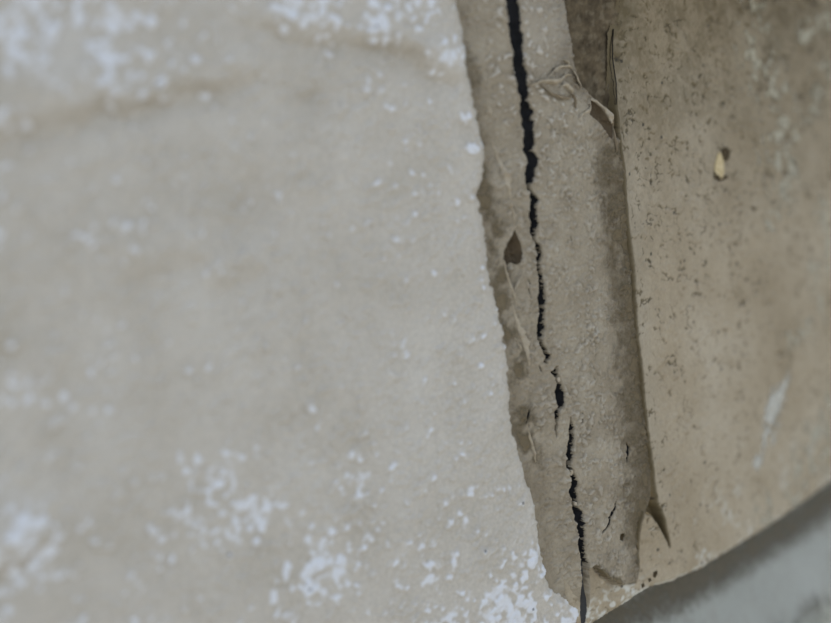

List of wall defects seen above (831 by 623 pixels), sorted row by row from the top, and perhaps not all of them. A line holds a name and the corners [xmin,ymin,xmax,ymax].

peeling [529,60,618,152]
peeling [503,260,531,366]
crack [505,0,617,623]